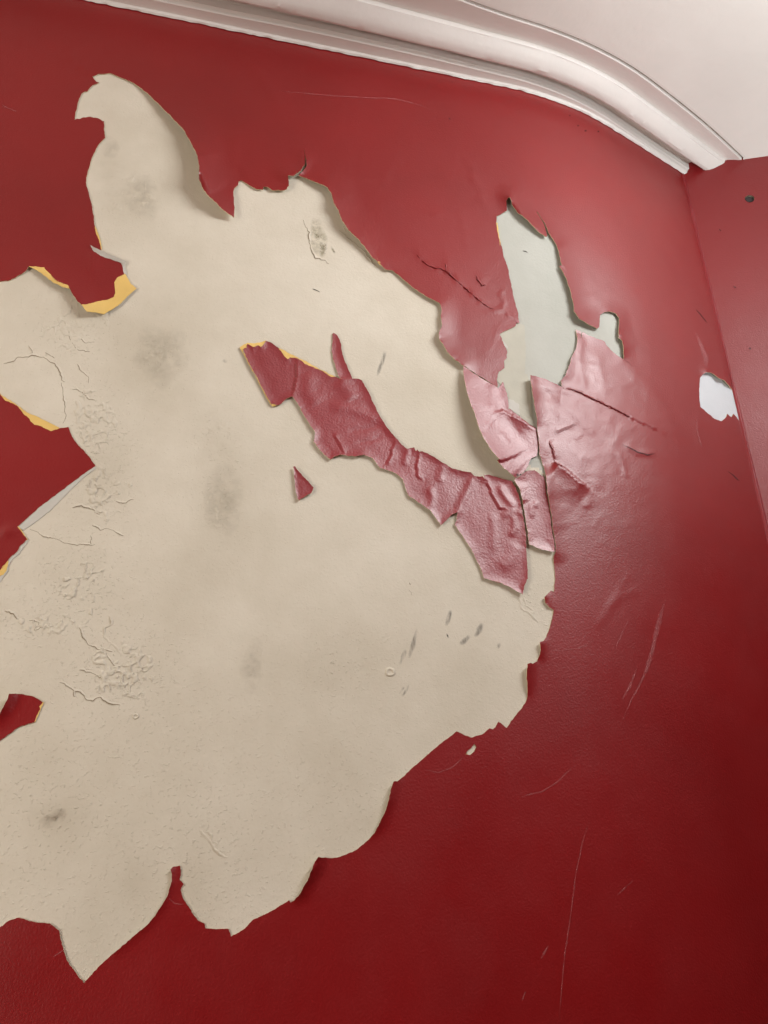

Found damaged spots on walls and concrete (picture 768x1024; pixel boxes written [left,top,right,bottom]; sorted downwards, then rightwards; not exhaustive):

crack [417,255,494,309]
crack [4,331,96,423]
crack [563,387,630,417]
peeling [699,372,739,421]
crack [30,498,134,546]
peeling [0,74,624,983]
crack [5,610,49,631]
crack [60,615,121,706]